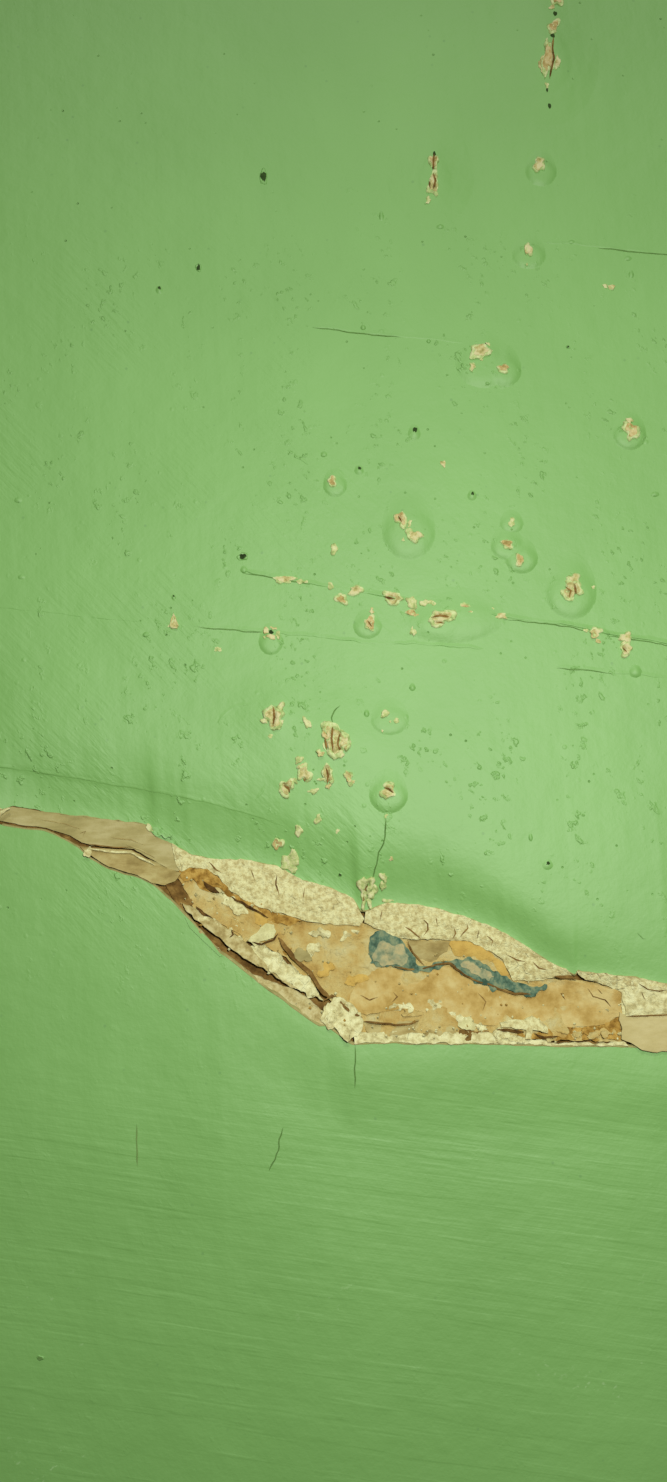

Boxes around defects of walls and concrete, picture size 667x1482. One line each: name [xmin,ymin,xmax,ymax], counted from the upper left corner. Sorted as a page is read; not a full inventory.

crack [313,324,463,343]
crack [244,569,409,600]
crack [166,605,667,678]
spalling [260,701,356,799]
peeling [0,806,667,1053]